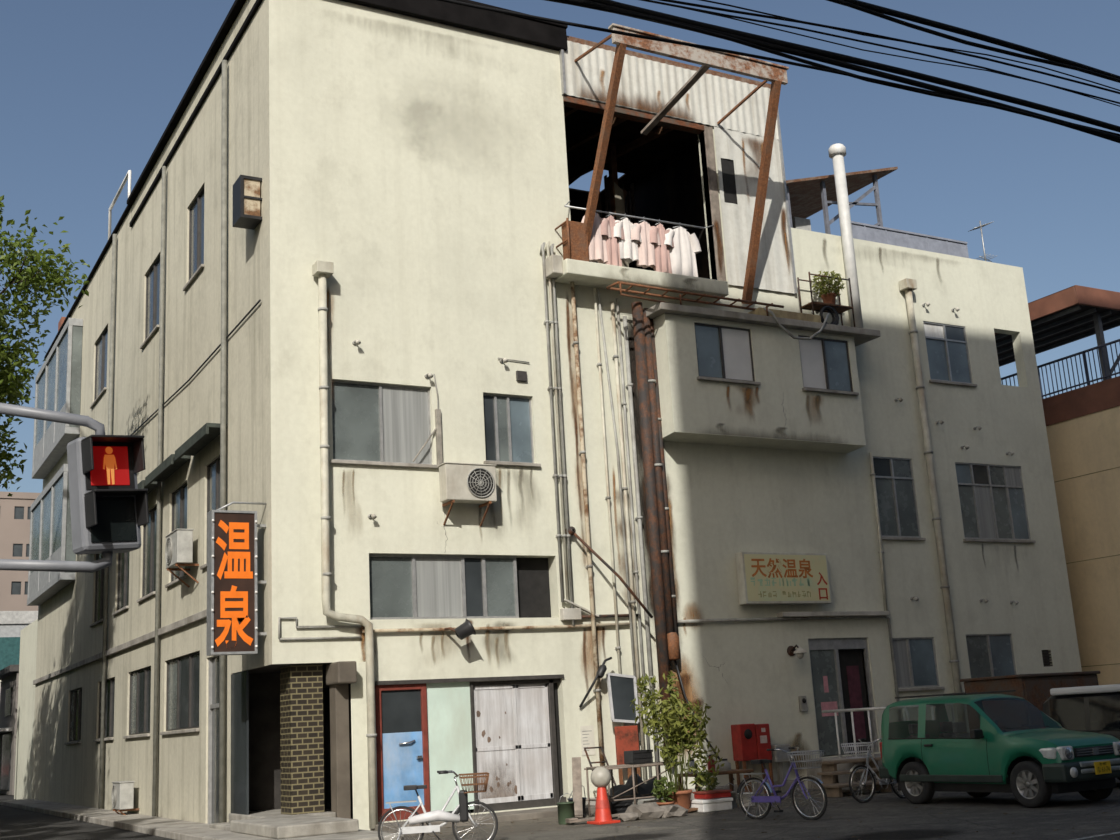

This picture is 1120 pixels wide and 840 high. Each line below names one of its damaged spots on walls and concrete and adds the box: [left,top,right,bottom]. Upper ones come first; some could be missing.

corrosion [581,71,691,120]
corrosion [742,140,763,167]
corrosion [715,222,723,266]
corrosion [781,209,790,258]
water stain [486,624,508,650]